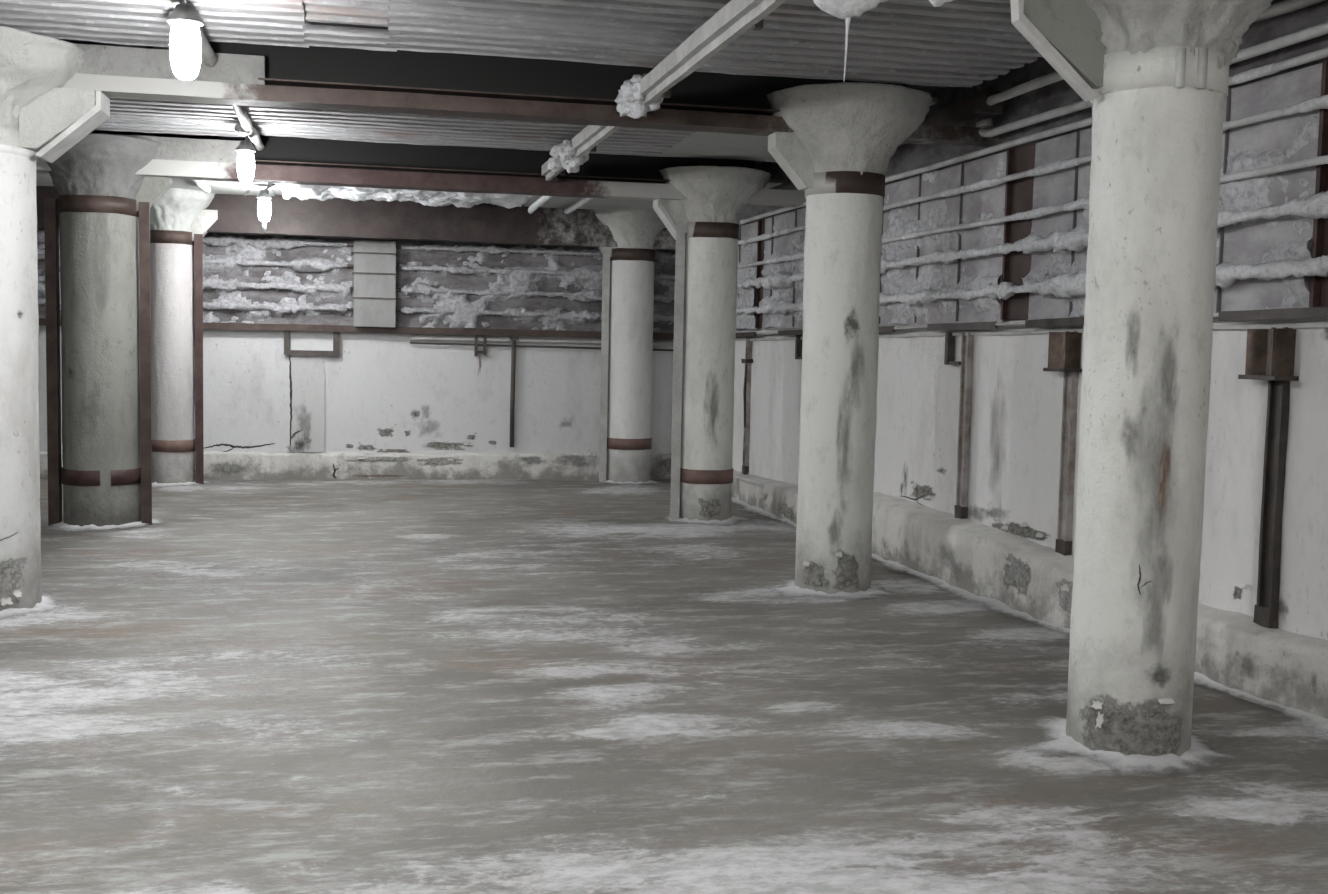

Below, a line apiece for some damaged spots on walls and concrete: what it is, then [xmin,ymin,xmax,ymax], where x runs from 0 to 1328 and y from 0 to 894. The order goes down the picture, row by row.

leakage [845,311,863,377]
leakage [1128,324,1136,357]
crack [205,356,301,452]
leakage [1124,348,1174,538]
peeling [992,522,1048,540]
spalling [0,558,26,606]
spalling [803,552,859,590]
spalling [1004,555,1030,594]
spalling [1057,580,1073,612]
leakage [1147,583,1161,645]
leakage [1154,668,1169,685]
spalling [1081,696,1182,756]